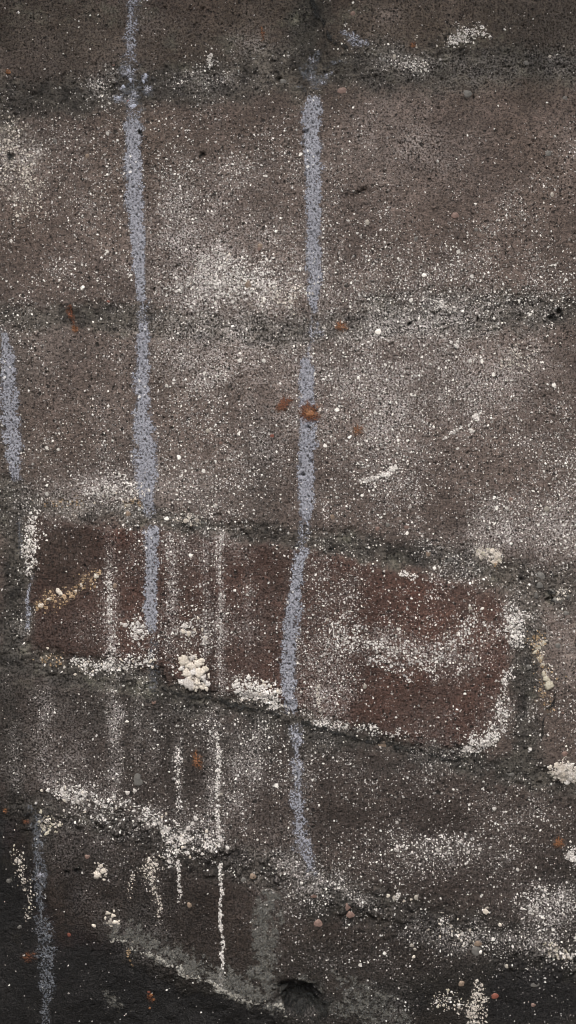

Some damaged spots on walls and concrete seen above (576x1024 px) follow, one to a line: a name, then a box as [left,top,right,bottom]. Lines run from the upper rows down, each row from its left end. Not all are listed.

leakage [0,328,25,482]
leakage [18,0,406,875]
corrosion [276,396,321,422]
efflorescence [314,599,567,712]
efflorescence [460,664,516,757]
leakage [6,733,231,1024]